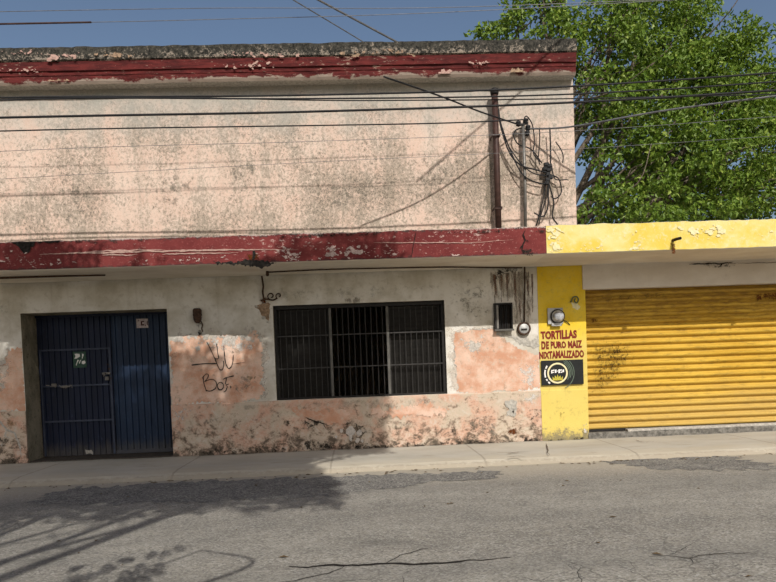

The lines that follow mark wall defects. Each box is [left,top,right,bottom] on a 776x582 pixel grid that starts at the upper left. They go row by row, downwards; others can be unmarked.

peeling [214,52,299,70]
spalling [0,241,61,267]
spalling [214,246,301,269]
peeling [315,243,397,259]
peeling [0,347,26,411]
peeling [169,325,270,405]
peeling [448,326,540,417]
damp [302,421,390,450]